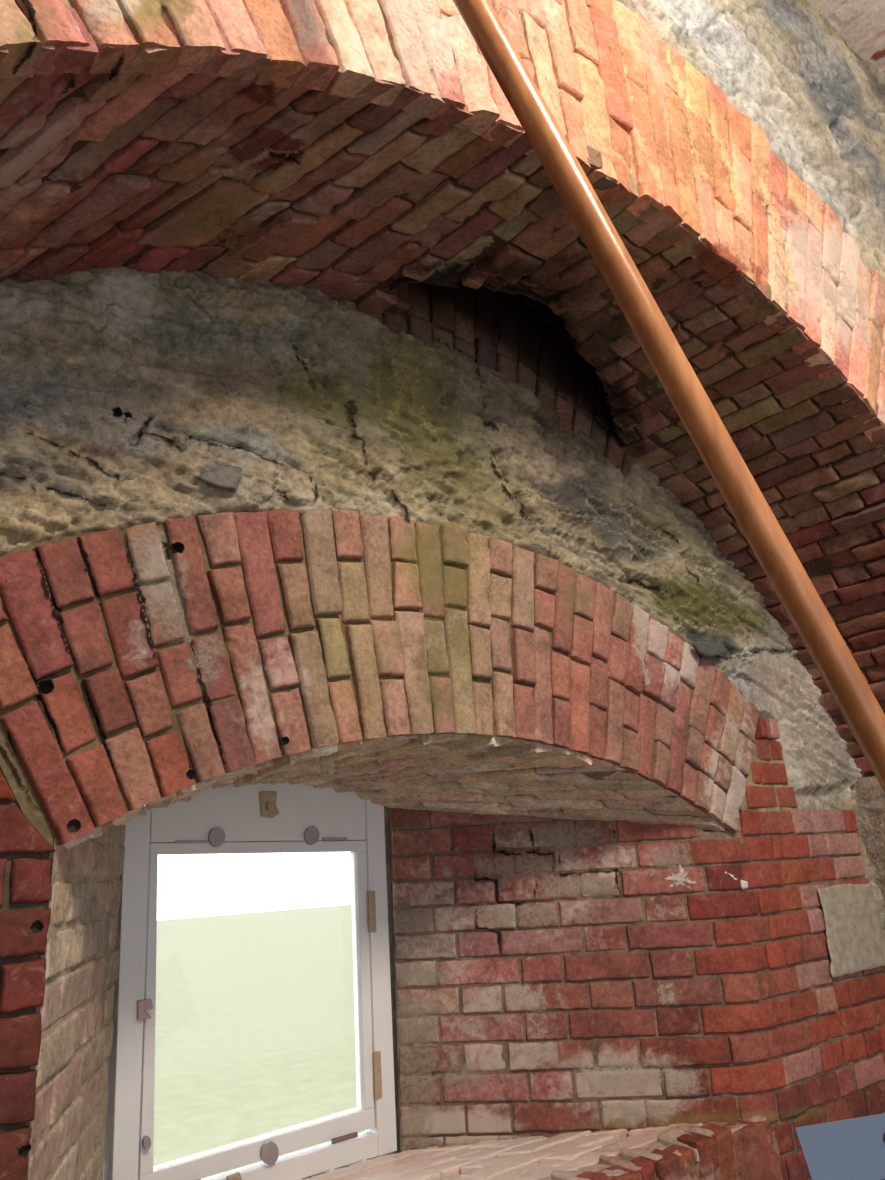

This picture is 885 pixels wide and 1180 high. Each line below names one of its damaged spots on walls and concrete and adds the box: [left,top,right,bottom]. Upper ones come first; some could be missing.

crack [293,345,312,382]
crack [0,433,132,506]
crack [344,399,411,523]